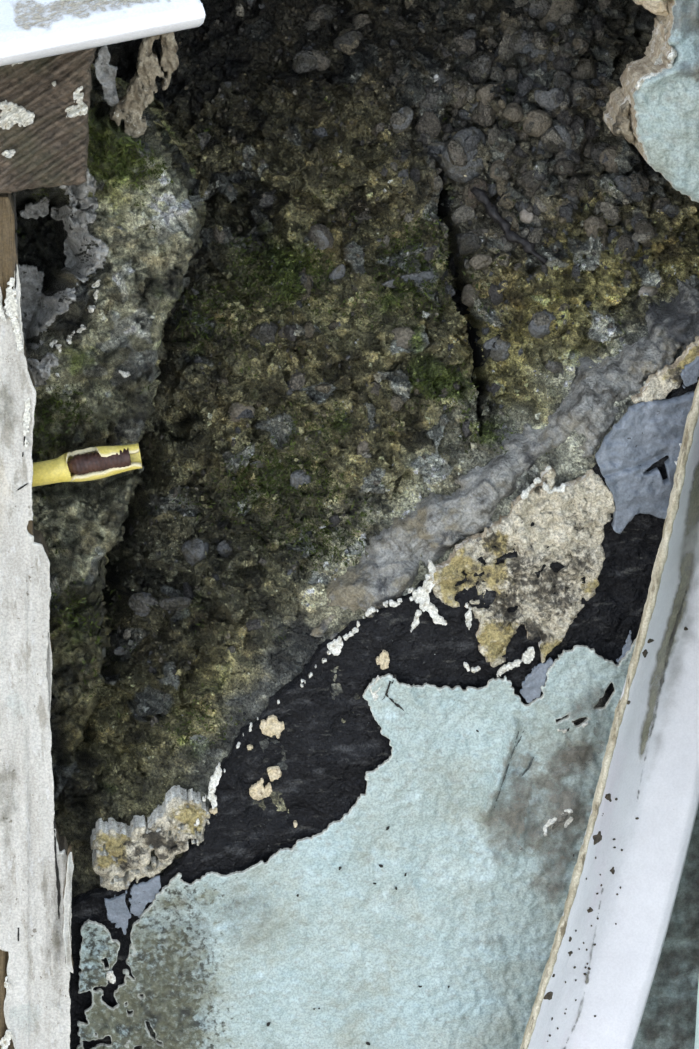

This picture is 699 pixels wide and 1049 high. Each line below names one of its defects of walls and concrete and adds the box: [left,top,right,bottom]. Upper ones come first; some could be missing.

peeling [0,168,109,449]
crack [435,175,503,436]
spalling [53,0,699,898]
damp [640,464,699,759]
peeling [0,1030,12,1049]
damp [492,746,594,897]
damp [642,835,699,1049]